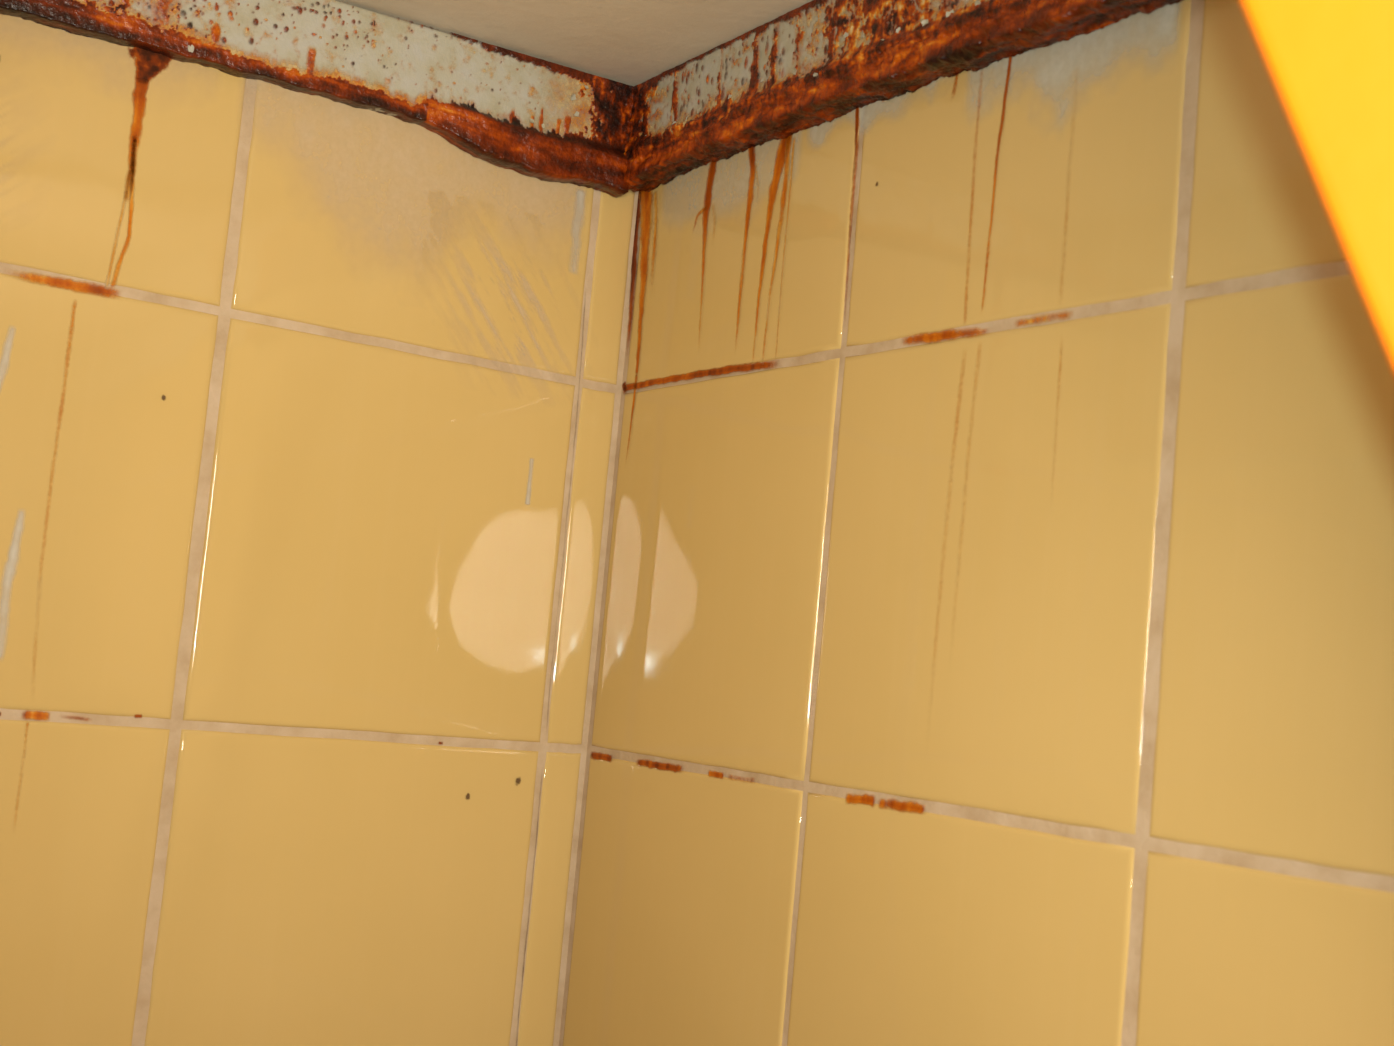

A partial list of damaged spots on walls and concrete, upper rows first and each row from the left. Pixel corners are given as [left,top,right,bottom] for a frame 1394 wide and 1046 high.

corrosion [0,0,437,376]
corrosion [398,0,1183,446]
corrosion [591,752,612,762]
corrosion [638,760,681,772]
corrosion [846,794,924,813]